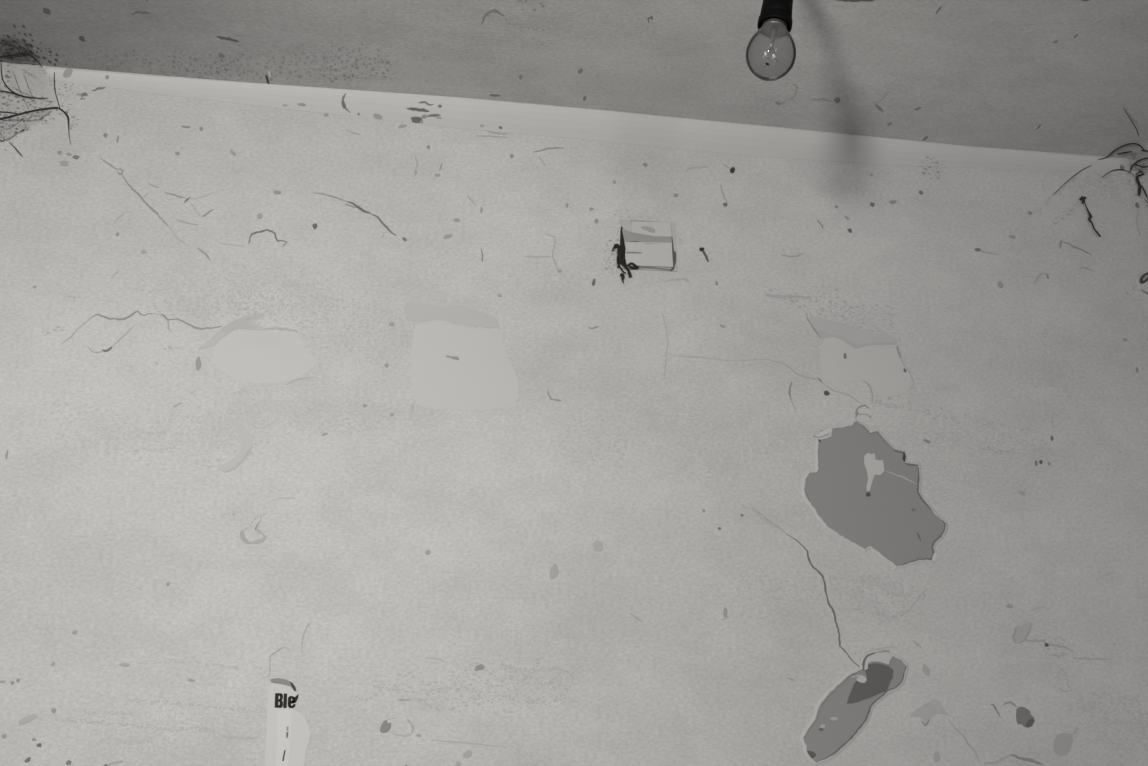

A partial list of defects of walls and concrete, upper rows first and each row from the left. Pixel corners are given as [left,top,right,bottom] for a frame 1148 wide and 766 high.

crack [42,295,298,366]
crack [765,293,821,338]
crack [661,310,954,484]
crack [805,427,865,549]
peeling [801,419,948,570]
crack [742,504,922,737]
peeling [800,650,909,766]